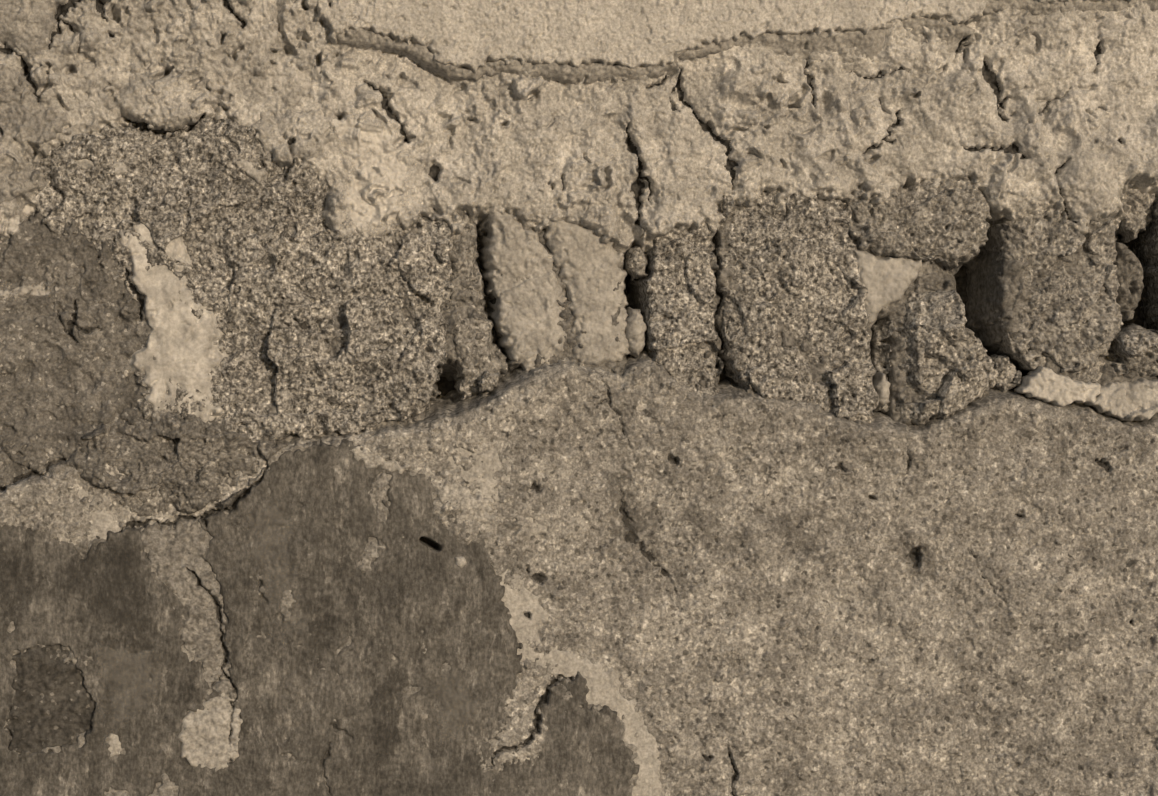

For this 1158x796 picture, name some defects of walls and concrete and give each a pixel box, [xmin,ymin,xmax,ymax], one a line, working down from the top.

spalling [0,0,1158,261]
crack [625,128,651,226]
crack [646,70,738,185]
crack [955,38,1026,159]
spalling [953,265,969,307]
spalling [1123,300,1148,329]
spalling [436,377,455,397]
spalling [719,367,738,386]
crack [126,478,262,528]
spalling [4,645,95,753]
crack [192,571,236,736]
crack [491,674,572,764]